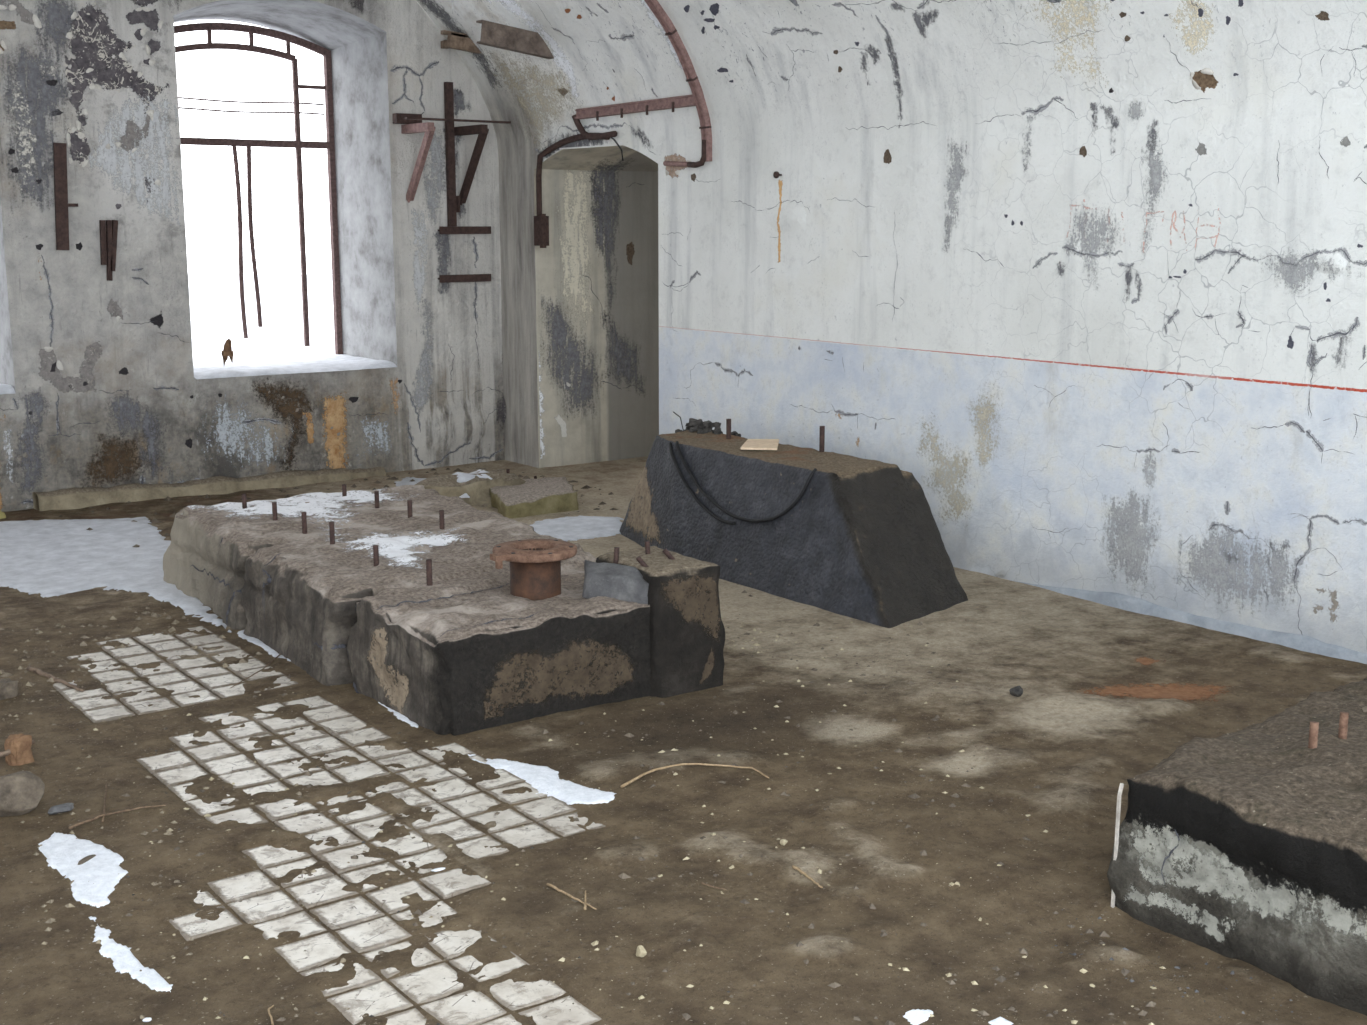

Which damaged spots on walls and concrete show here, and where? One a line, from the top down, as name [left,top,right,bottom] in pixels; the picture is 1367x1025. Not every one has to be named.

spalling [0,0,42,54]
peeling [8,81,42,190]
peeling [40,0,183,227]
crack [987,96,1077,122]
spalling [1190,68,1239,93]
water stain [477,0,643,459]
crack [969,244,1367,465]
water stain [85,393,171,487]
corrosion [302,391,349,469]
water stain [1100,451,1158,590]
water stain [1179,528,1299,608]
crack [1178,501,1367,634]